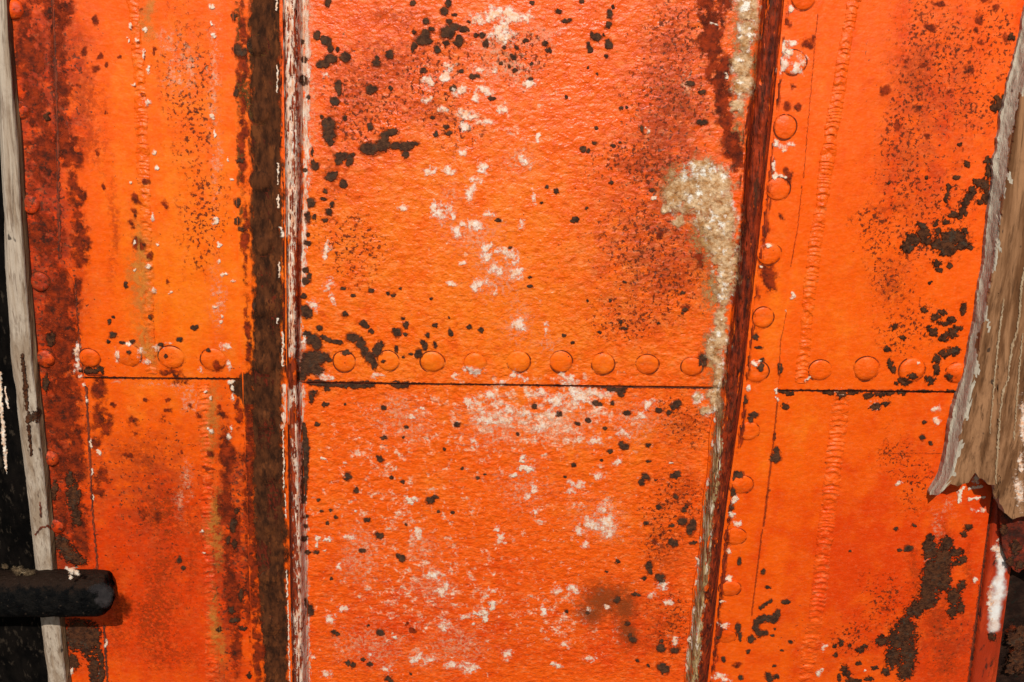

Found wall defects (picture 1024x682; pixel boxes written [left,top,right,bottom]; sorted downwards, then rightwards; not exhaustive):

peeling [504,151,535,168]
peeling [430,163,533,295]
peeling [900,155,991,285]
peeling [275,0,455,682]
rust [13,0,801,682]
peeling [508,309,528,336]
damp [661,159,740,682]
peeling [774,388,795,410]
peeling [822,301,967,411]
peeling [920,406,941,445]
peeling [409,588,498,675]